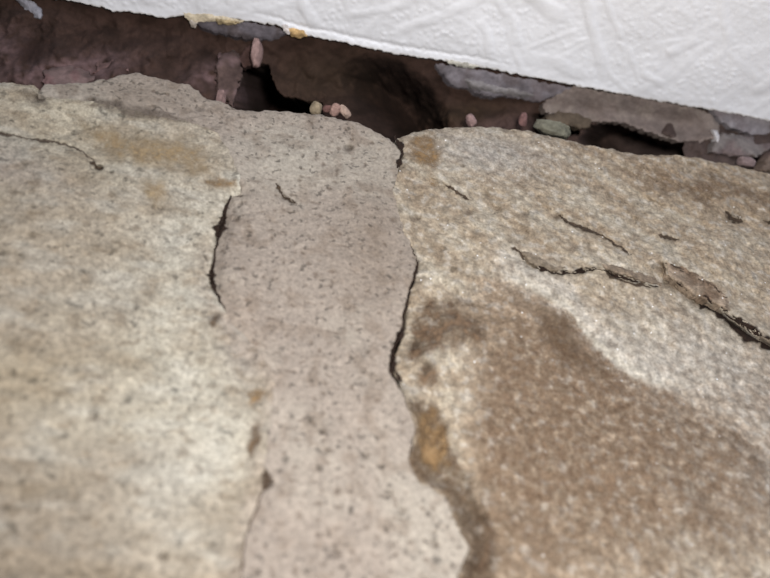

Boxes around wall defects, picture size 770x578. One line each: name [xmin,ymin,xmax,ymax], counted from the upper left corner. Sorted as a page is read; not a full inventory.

peeling [16,0,43,20]
spalling [250,38,263,68]
peeling [465,78,534,99]
crack [0,132,103,169]
crack [394,136,404,168]
crack [725,211,743,223]
crack [206,196,232,309]
crack [559,215,632,255]
crack [658,233,678,241]
crack [512,247,770,350]
crack [389,246,419,389]